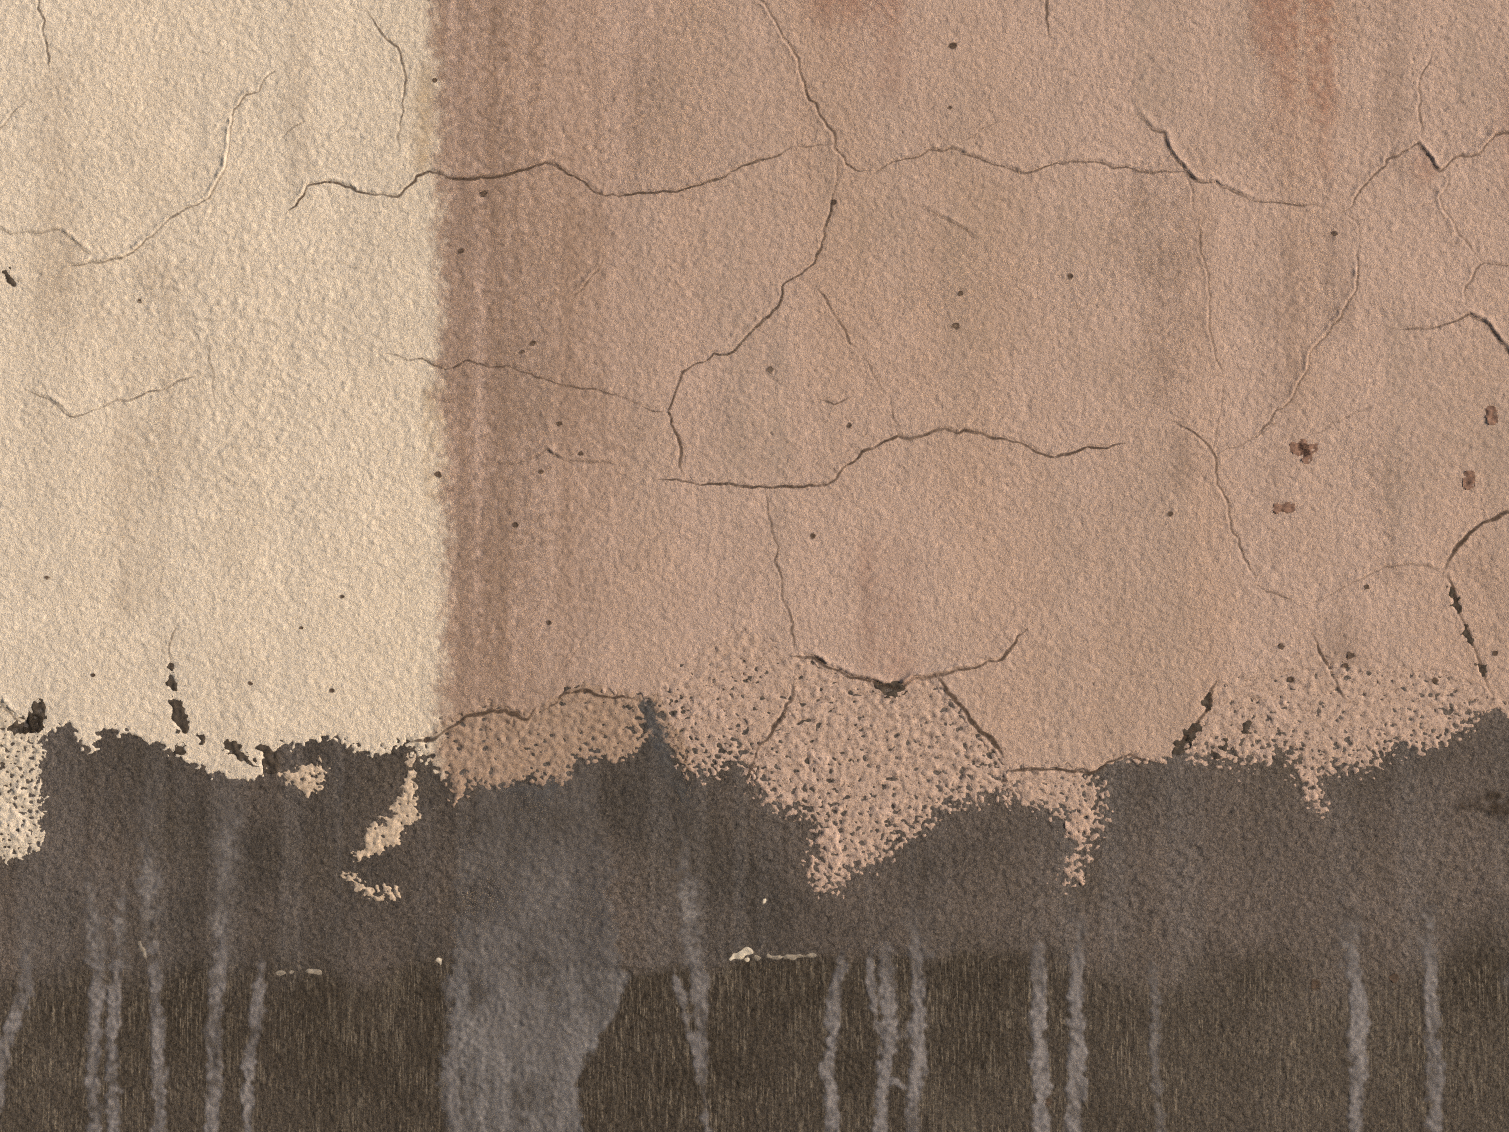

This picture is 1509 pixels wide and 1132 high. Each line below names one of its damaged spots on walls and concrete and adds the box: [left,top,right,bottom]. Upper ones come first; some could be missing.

crack [291,154,781,209]
crack [667,199,1116,489]
crack [1449,510,1509,602]
spalling [0,695,49,865]
spalling [165,662,205,755]
spalling [405,629,1149,899]
crack [940,634,1145,775]
spalling [1171,586,1509,819]
leakage [85,846,168,1132]
leakage [441,934,627,1132]
leakage [866,929,933,1132]
leakage [1028,923,1088,1132]